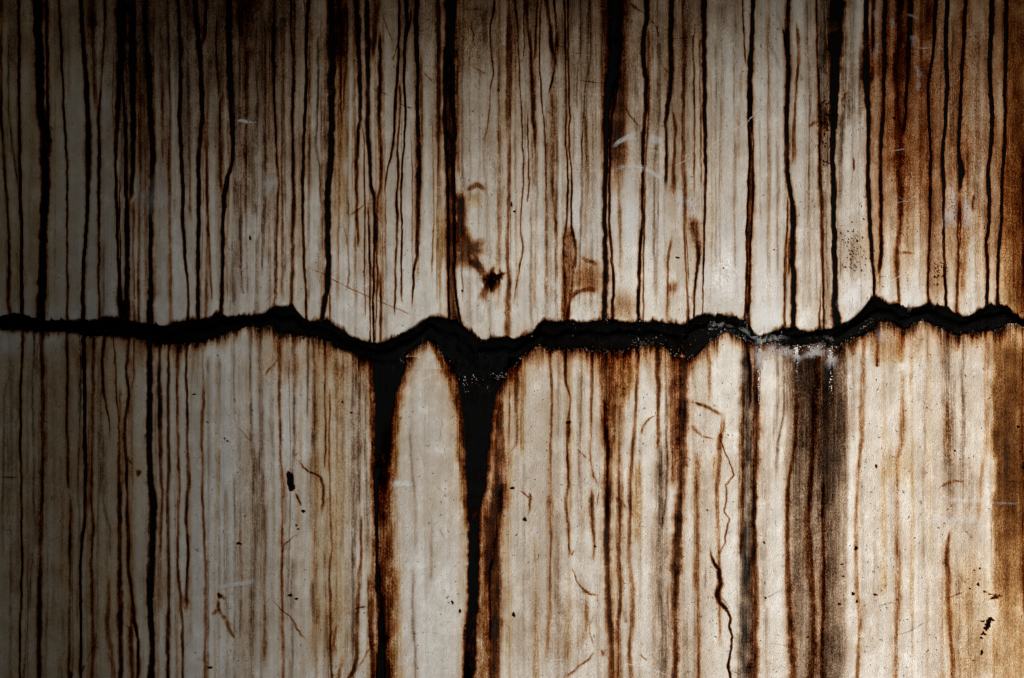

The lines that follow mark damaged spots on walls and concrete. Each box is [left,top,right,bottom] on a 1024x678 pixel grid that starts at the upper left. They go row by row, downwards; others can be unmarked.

leakage [0,0,463,678]
corrosion [437,0,513,341]
crack [0,202,1024,404]
corrosion [573,0,629,321]
corrosion [871,0,1024,253]
leakage [430,340,524,678]
crack [693,402,734,678]